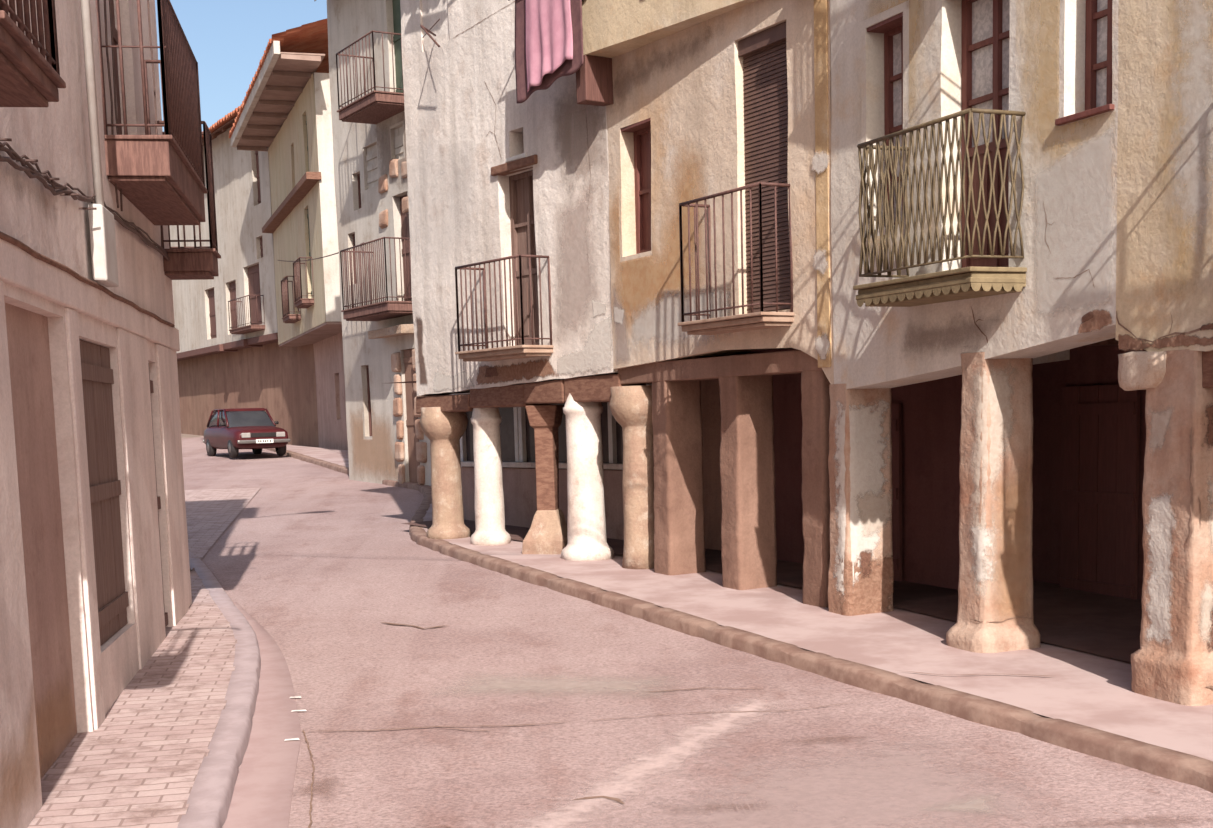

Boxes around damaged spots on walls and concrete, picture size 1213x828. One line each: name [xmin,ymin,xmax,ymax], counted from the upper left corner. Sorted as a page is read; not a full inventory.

spalling [1078,309,1213,351]
peeling [834,400,894,616]
peeling [1146,495,1176,642]
peeling [1200,584,1213,652]